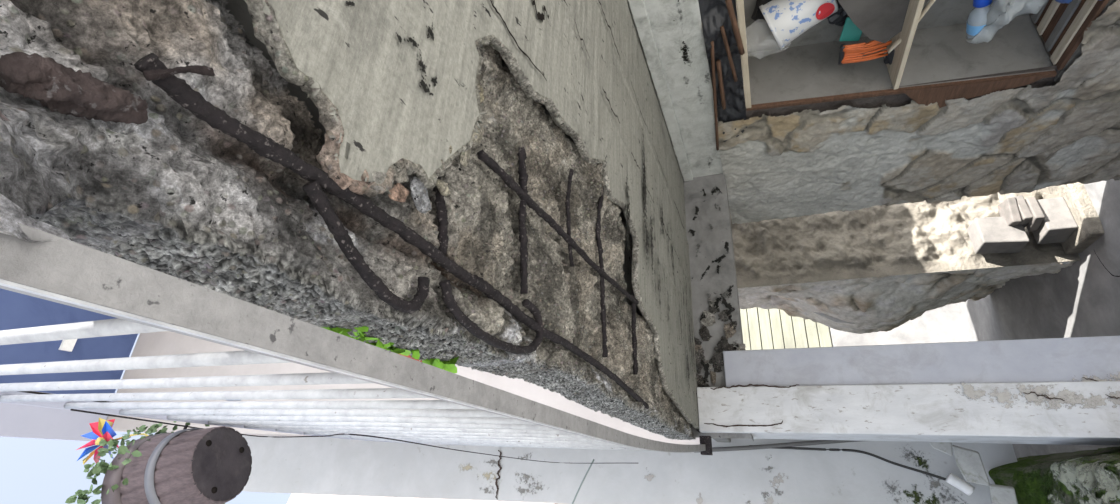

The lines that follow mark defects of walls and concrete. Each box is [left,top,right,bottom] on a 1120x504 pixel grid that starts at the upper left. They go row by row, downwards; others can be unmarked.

spalling [0,0,700,440]
spalling [694,297,746,387]
peeling [955,372,1120,410]
crack [494,450,502,504]
damp [885,450,957,504]